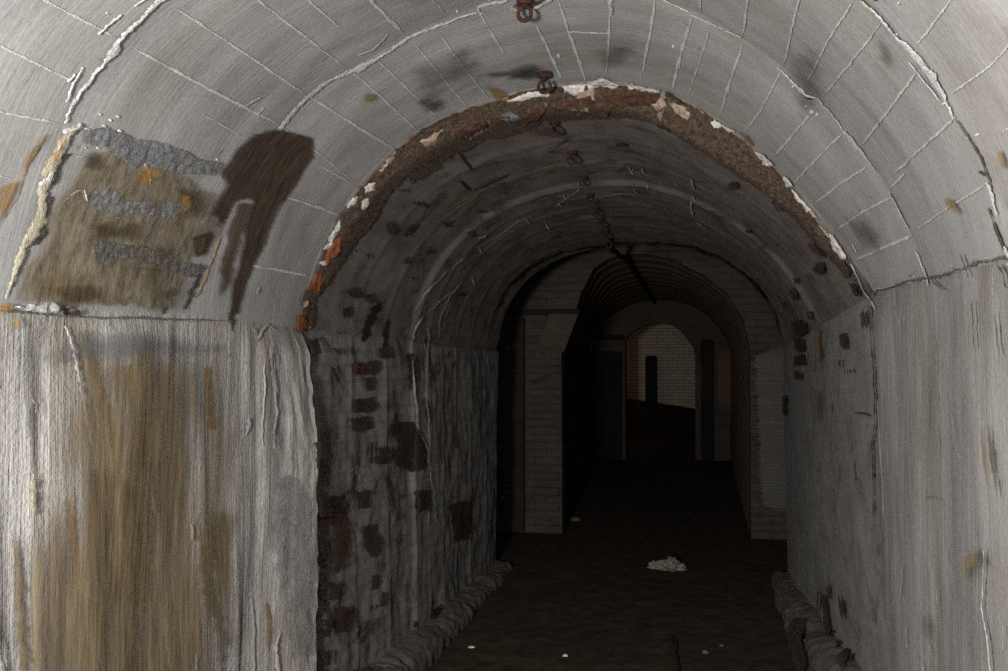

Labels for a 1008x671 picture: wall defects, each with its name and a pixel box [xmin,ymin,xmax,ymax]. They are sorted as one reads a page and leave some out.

leakage [5,0,166,298]
leakage [14,326,232,671]
leakage [245,345,279,448]
leakage [250,592,280,671]
leakage [162,0,507,331]
peeling [354,490,371,510]
peeling [369,422,425,472]
peeling [414,490,429,514]
leakage [411,258,464,523]
spalling [295,78,875,432]
crack [854,120,1008,535]